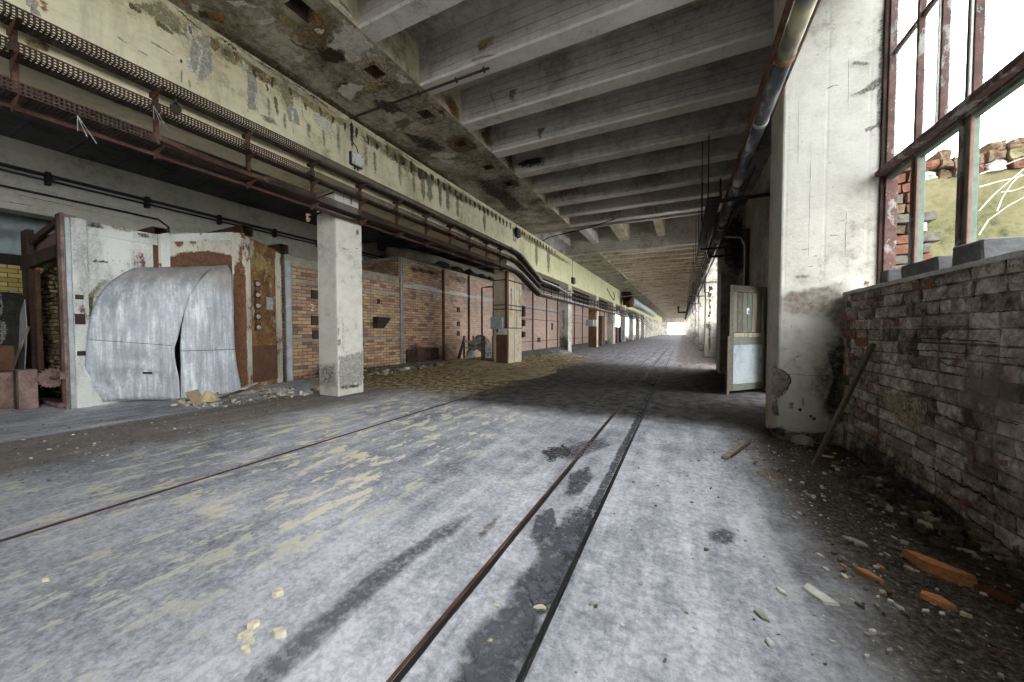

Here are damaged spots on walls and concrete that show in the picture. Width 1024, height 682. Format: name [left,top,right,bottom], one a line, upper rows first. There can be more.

peeling [180,24,213,83]
leakage [278,10,347,64]
peeling [242,60,258,113]
leakage [221,33,566,271]
corrosion [159,248,272,388]
leakage [784,288,841,320]
spalling [771,367,816,420]